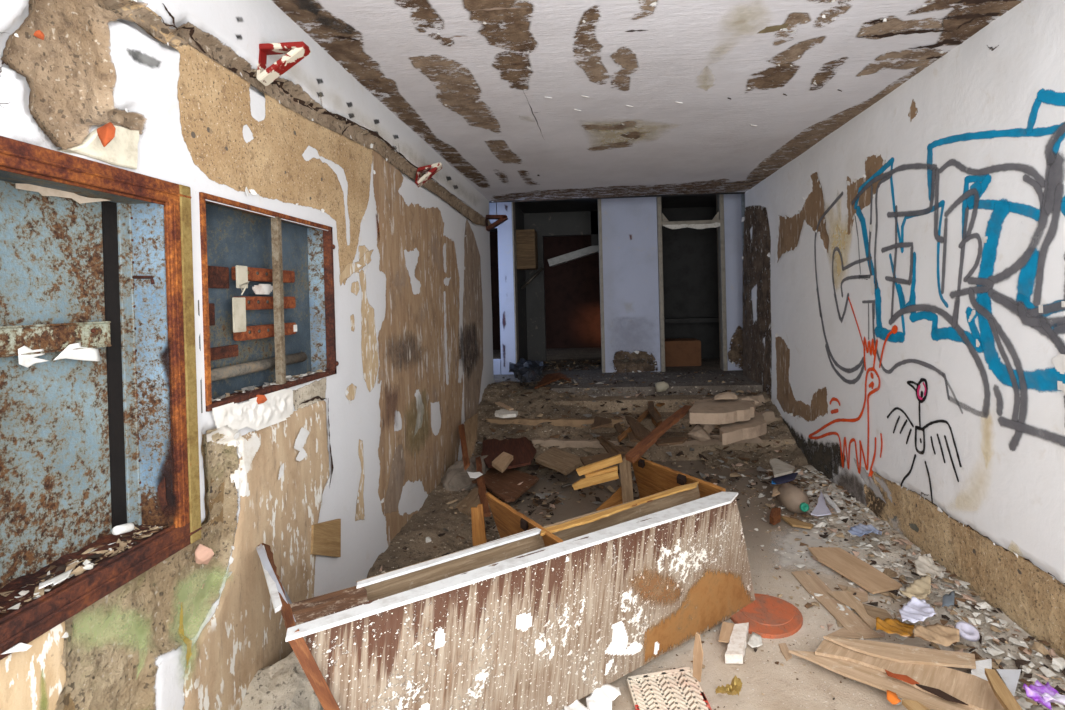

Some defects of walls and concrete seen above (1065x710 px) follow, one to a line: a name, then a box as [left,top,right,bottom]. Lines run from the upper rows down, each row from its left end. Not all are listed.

peeling [1,0,1023,546]
corrosion [158,341,178,517]
peeling [1052,354,1065,395]
peeling [0,377,330,710]
damp [179,603,192,665]
spalling [864,471,1065,660]